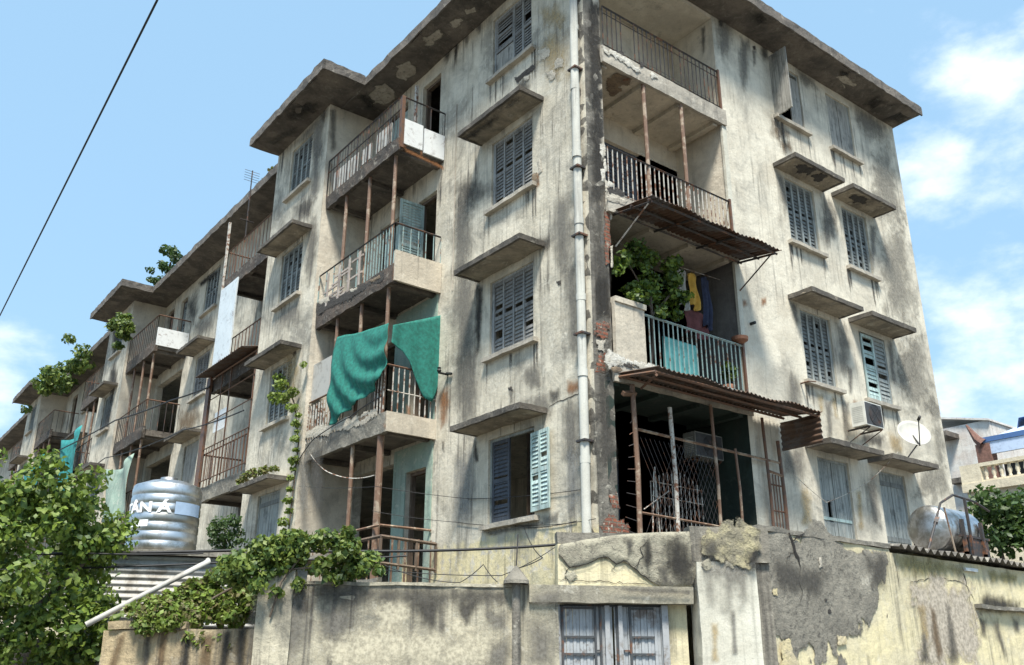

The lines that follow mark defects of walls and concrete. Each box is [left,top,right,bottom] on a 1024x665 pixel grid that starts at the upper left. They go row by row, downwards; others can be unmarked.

peeling [423,7,476,46]
peeling [369,61,416,105]
water stain [456,181,512,415]
water stain [540,196,576,348]
water stain [831,150,910,316]
spalling [594,321,655,373]
spalling [305,407,377,439]
water stain [889,338,947,494]
flaking render [558,494,747,590]
flaking render [768,519,889,665]
water stain [921,608,956,660]
water stain [980,596,1018,652]